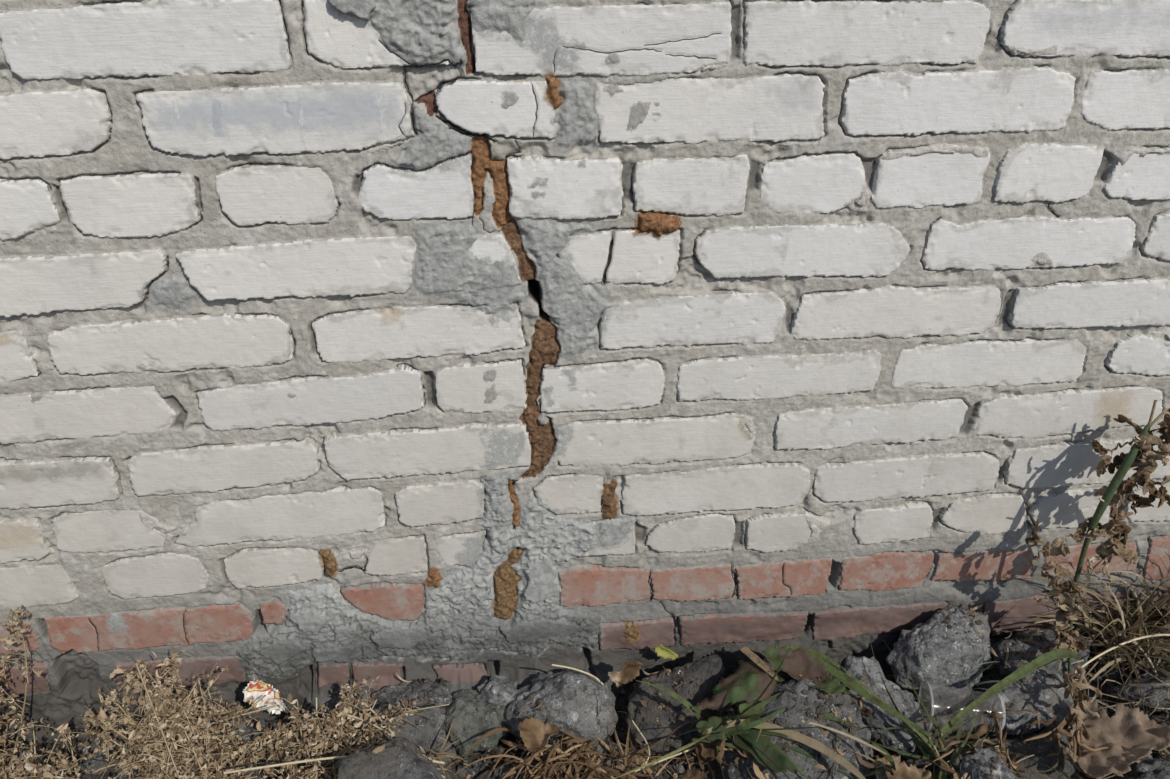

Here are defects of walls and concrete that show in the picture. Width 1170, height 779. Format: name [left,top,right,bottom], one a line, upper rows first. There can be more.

peeling [328,0,376,20]
crack [553,33,717,66]
crack [603,232,614,284]
crack [384,0,561,620]
spalling [339,541,377,565]
peeling [523,555,561,603]